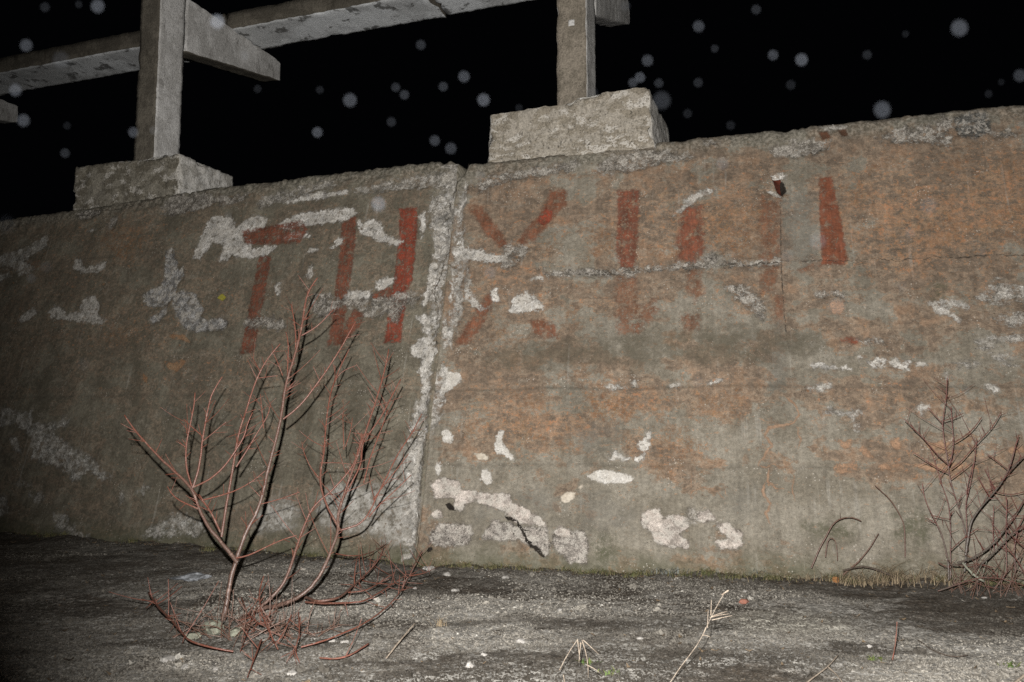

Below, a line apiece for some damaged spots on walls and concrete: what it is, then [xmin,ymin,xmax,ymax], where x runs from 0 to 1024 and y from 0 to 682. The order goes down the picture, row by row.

spalling [768,173,786,198]
crack [505,516,545,558]